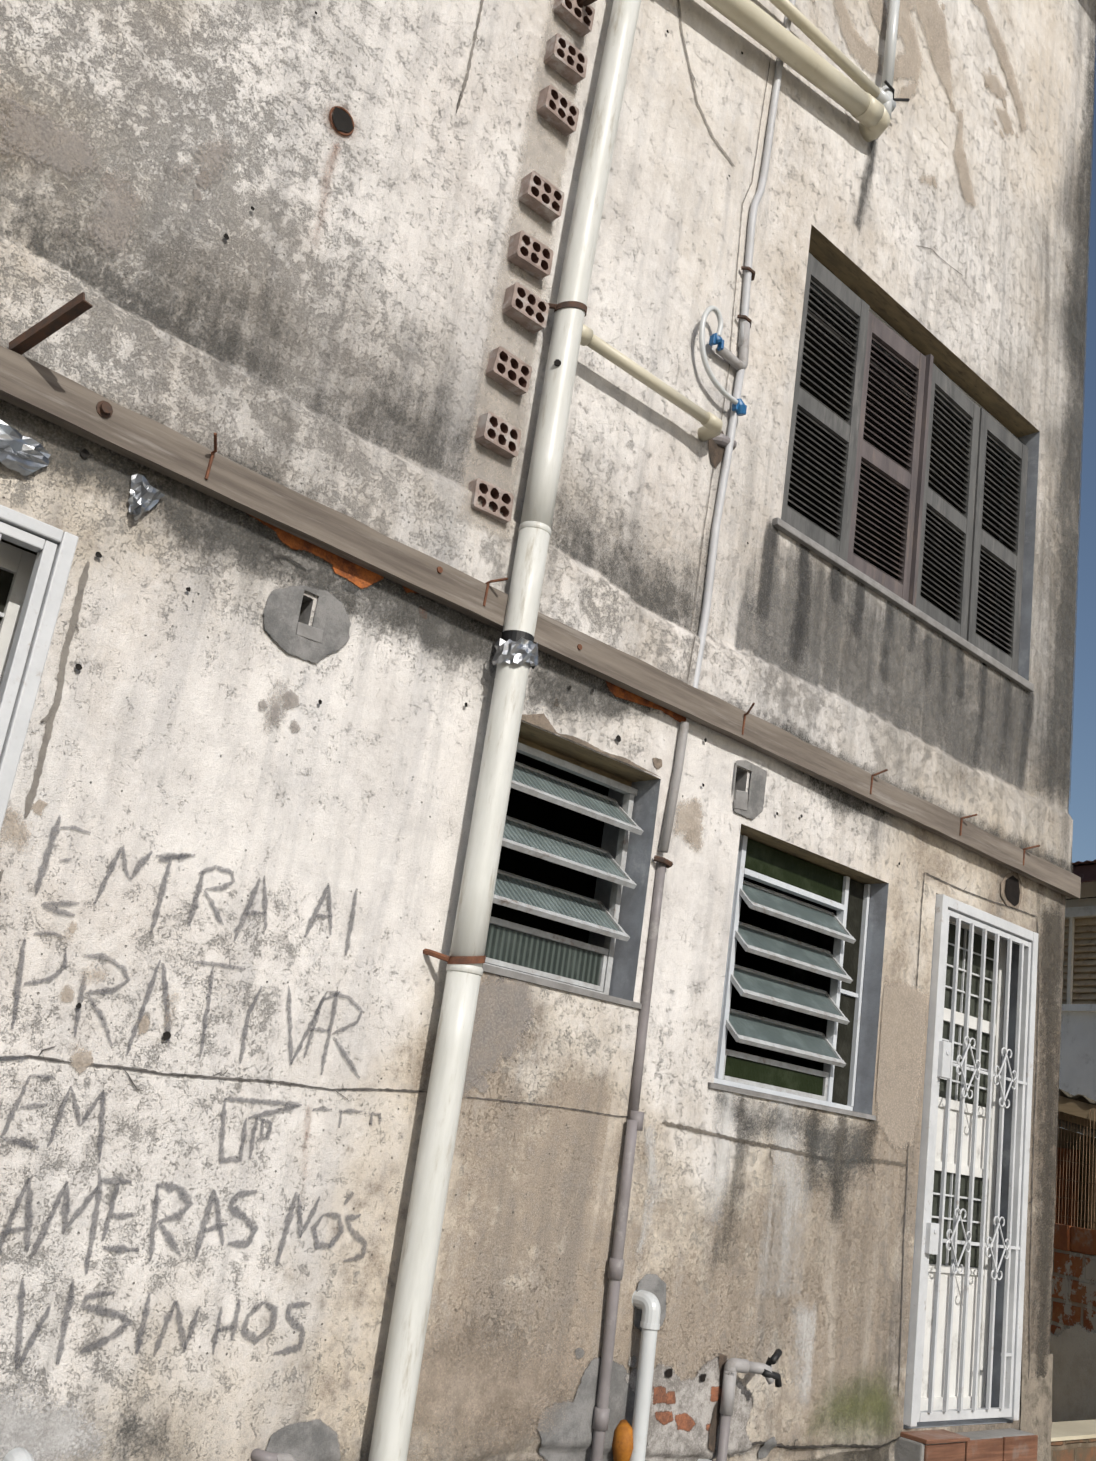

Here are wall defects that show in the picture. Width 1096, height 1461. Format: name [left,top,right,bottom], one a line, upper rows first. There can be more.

damp [0,192,285,383]
damp [736,9,1096,803]
damp [0,389,497,670]
flaking render [246,513,384,593]
crack [4,1046,427,1101]
damp [714,1091,878,1261]
flaking render [625,1353,753,1461]
damp [803,1444,890,1461]